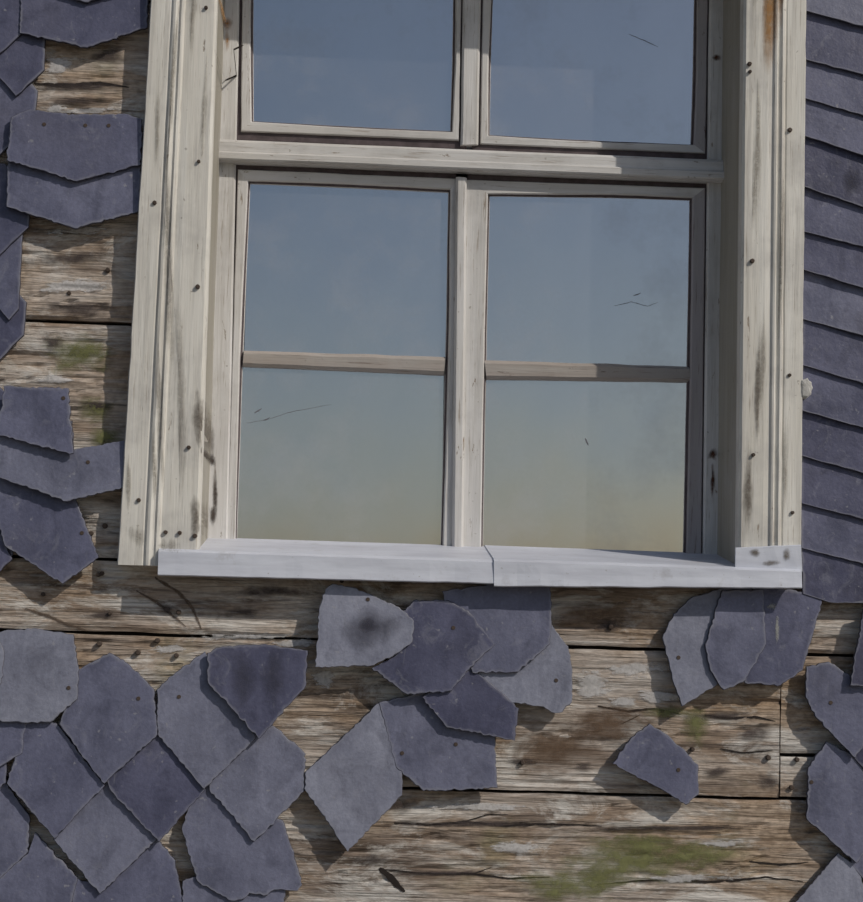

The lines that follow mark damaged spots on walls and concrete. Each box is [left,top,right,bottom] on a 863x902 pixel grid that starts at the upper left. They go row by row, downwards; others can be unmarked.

rust [765,0,775,42]
peeling [46,58,71,73]
peeling [48,105,115,113]
peeling [40,279,106,293]
peeling [39,375,73,383]
peeling [203,632,311,647]
peeling [152,645,185,653]
peeling [574,662,678,705]
peeling [423,803,524,811]
peeling [491,841,546,856]
peeling [651,874,732,883]